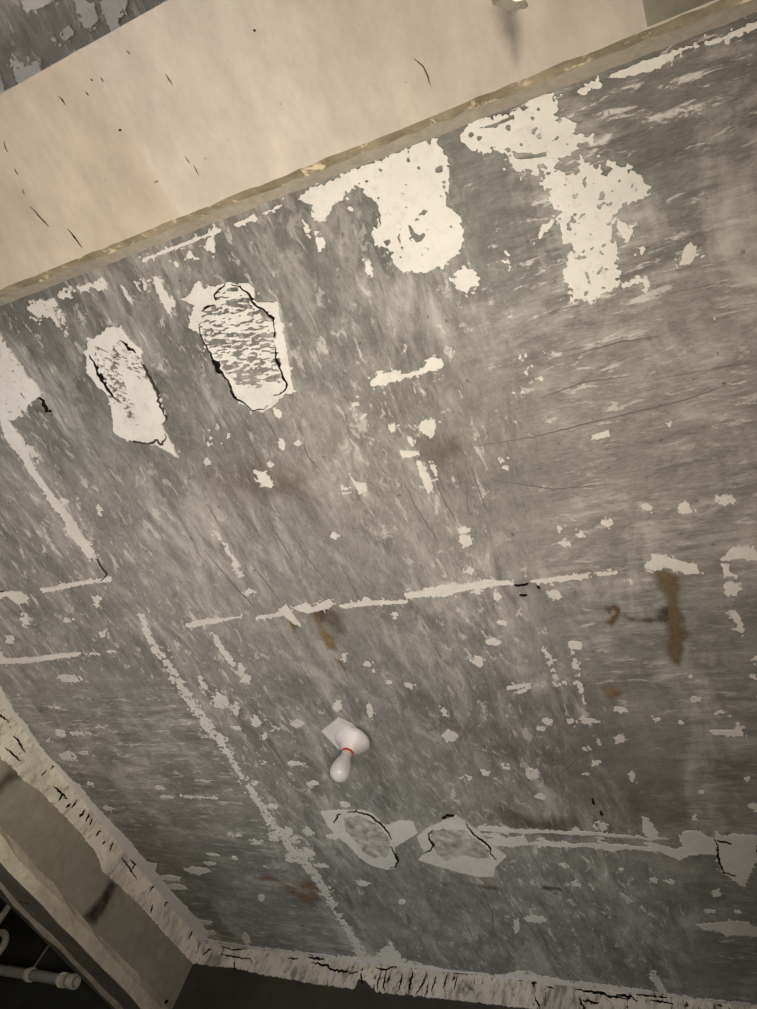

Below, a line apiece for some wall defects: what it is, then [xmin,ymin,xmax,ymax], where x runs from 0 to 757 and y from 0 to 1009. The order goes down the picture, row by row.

peeling [298,138,481,297]
peeling [460,92,652,305]
peeling [0,334,41,420]
peeling [26,276,108,337]
peeling [82,325,180,458]
peeling [120,276,297,418]
crack [0,714,26,761]
rust [314,612,343,665]
peeling [541,641,601,727]
rust [630,572,684,664]
crack [41,765,168,913]
peeling [0,703,757,1009]